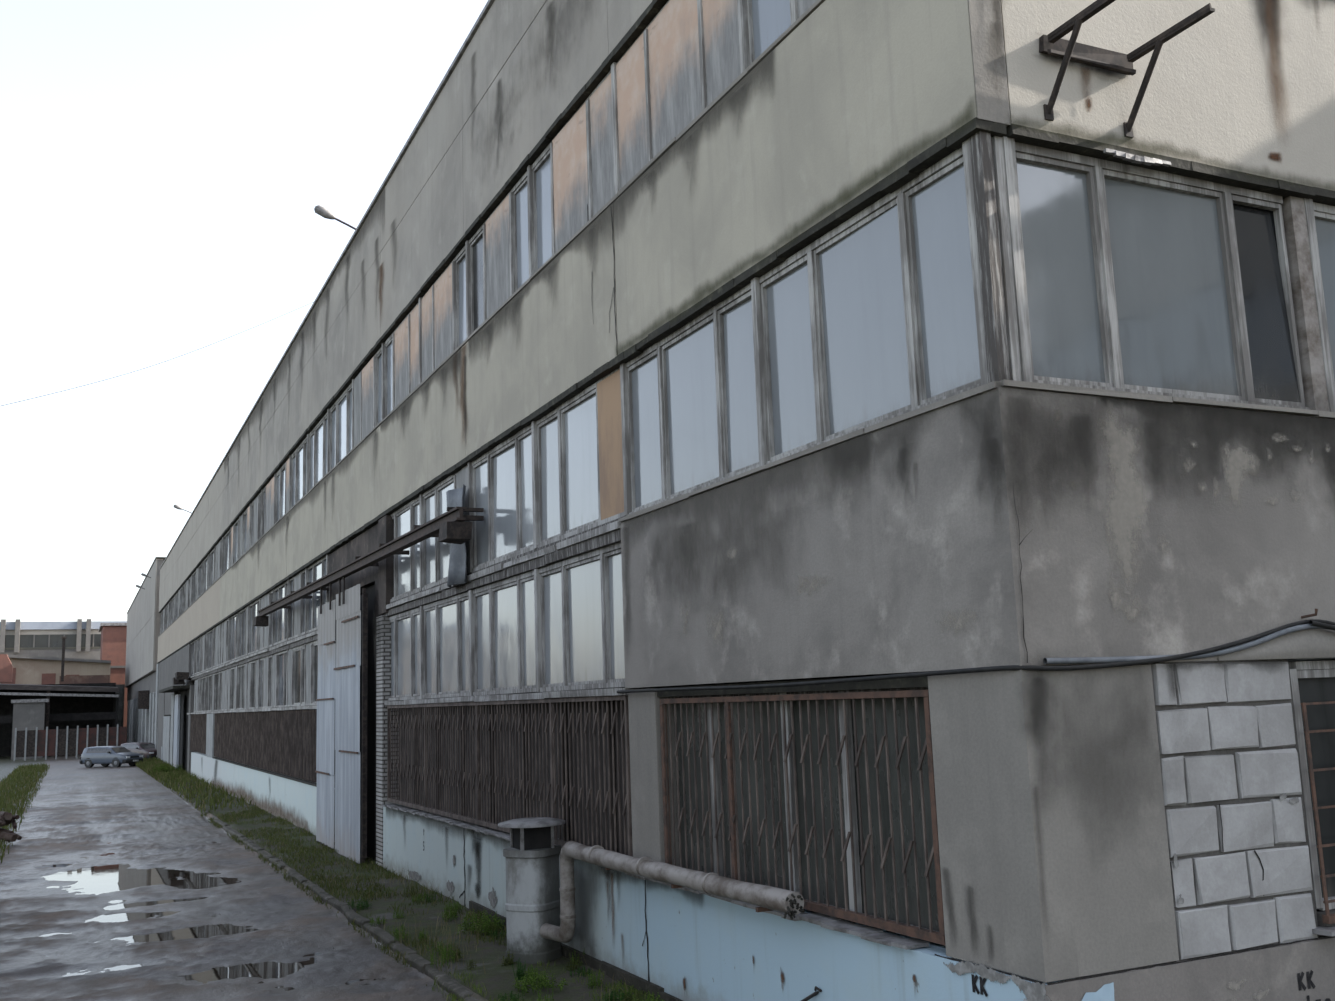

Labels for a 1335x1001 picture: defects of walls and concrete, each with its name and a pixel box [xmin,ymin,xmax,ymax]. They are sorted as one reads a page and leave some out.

water stain [1262,0,1282,102]
water stain [224,50,772,567]
water stain [625,432,907,531]
peeling [943,960,1046,1001]